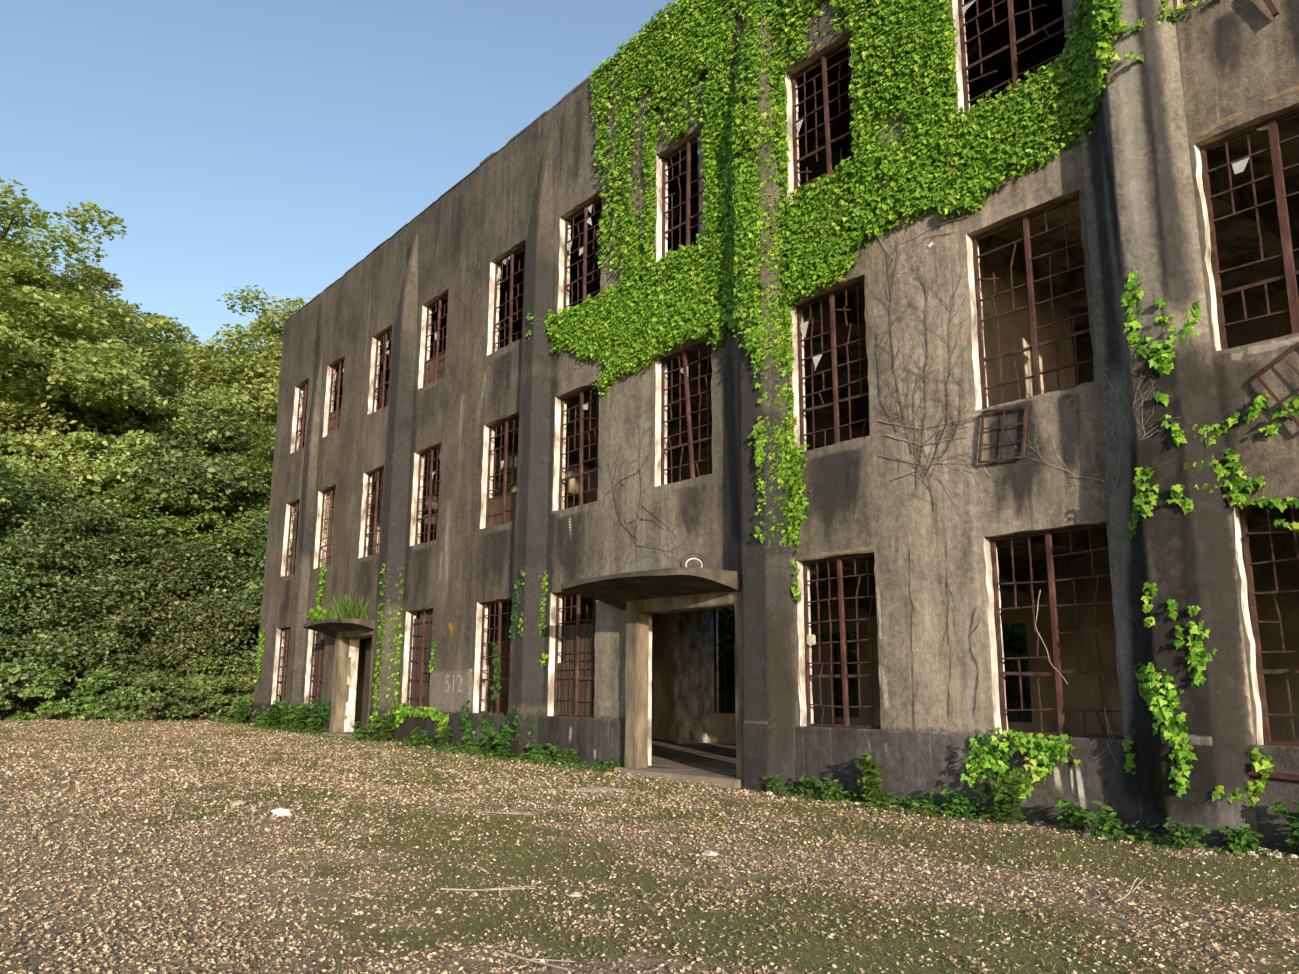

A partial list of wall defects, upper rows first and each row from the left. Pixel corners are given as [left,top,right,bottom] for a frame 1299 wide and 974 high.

leakage [1215,12,1240,66]
leakage [1287,0,1299,49]
leakage [1137,0,1196,307]
leakage [1088,99,1126,364]
leakage [990,401,1042,509]
leakage [1058,394,1079,467]
leakage [1124,342,1251,812]